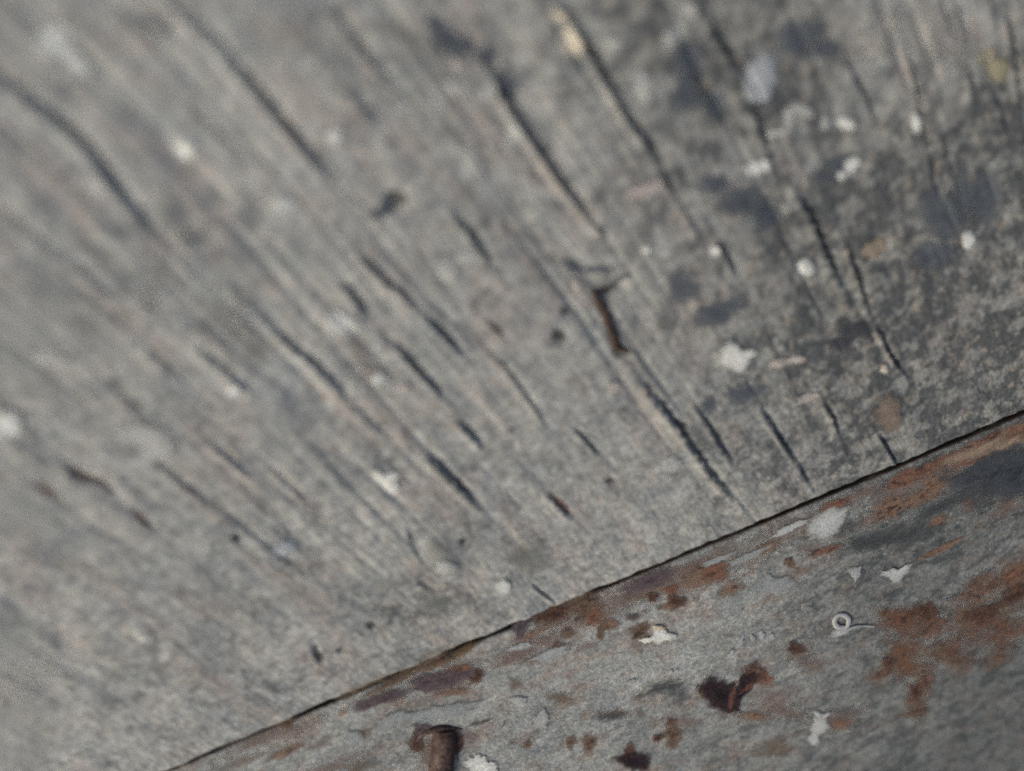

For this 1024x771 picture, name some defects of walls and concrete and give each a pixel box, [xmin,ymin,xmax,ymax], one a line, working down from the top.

corrosion [822,495,858,511]
corrosion [869,424,1024,520]
corrosion [511,562,740,648]
corrosion [958,563,1024,645]
corrosion [339,645,483,716]
corrosion [696,662,779,720]
corrosion [873,601,940,719]
corrosion [406,724,431,752]
corrosion [455,729,465,761]